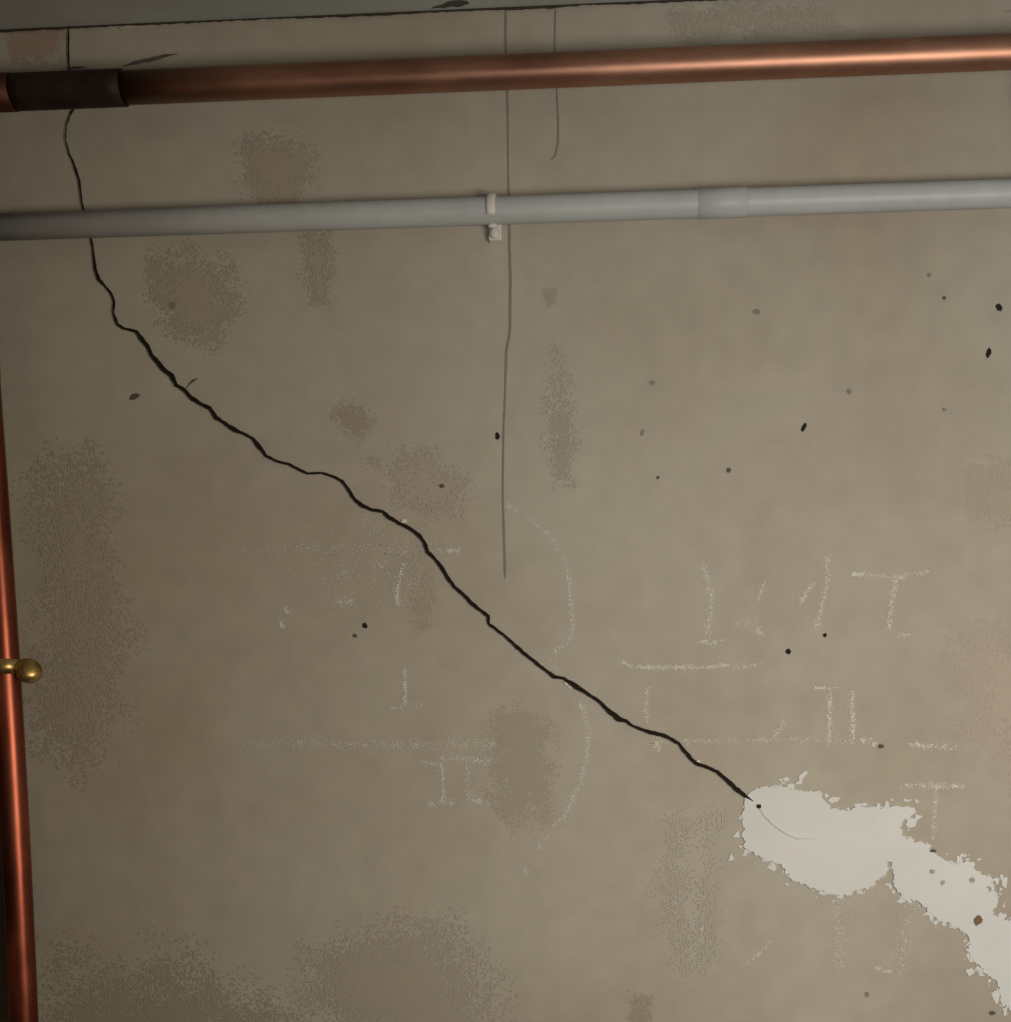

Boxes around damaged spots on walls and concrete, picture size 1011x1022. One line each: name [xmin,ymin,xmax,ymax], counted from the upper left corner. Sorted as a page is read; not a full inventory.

crack [65,109,85,210]
crack [504,90,512,196]
crack [550,88,559,160]
crack [90,224,809,840]